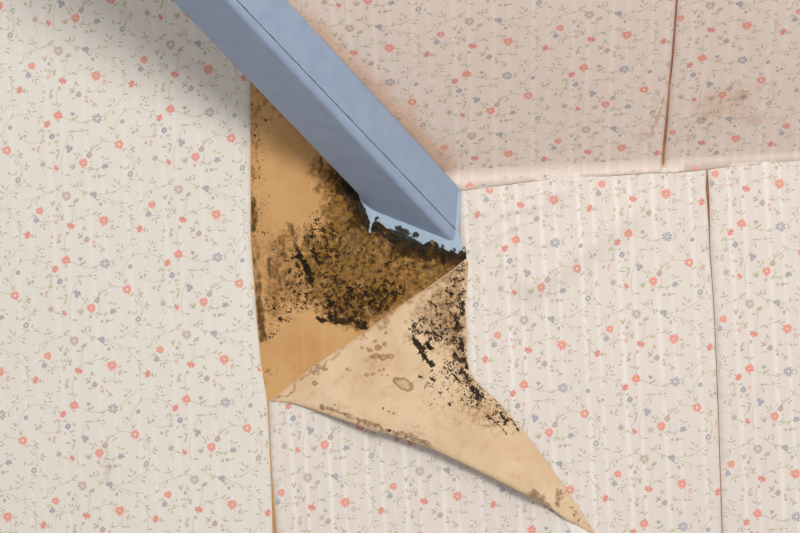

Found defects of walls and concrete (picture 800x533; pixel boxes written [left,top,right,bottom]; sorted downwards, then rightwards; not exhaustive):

flaking render [250,81,455,404]
leakage [251,157,520,435]